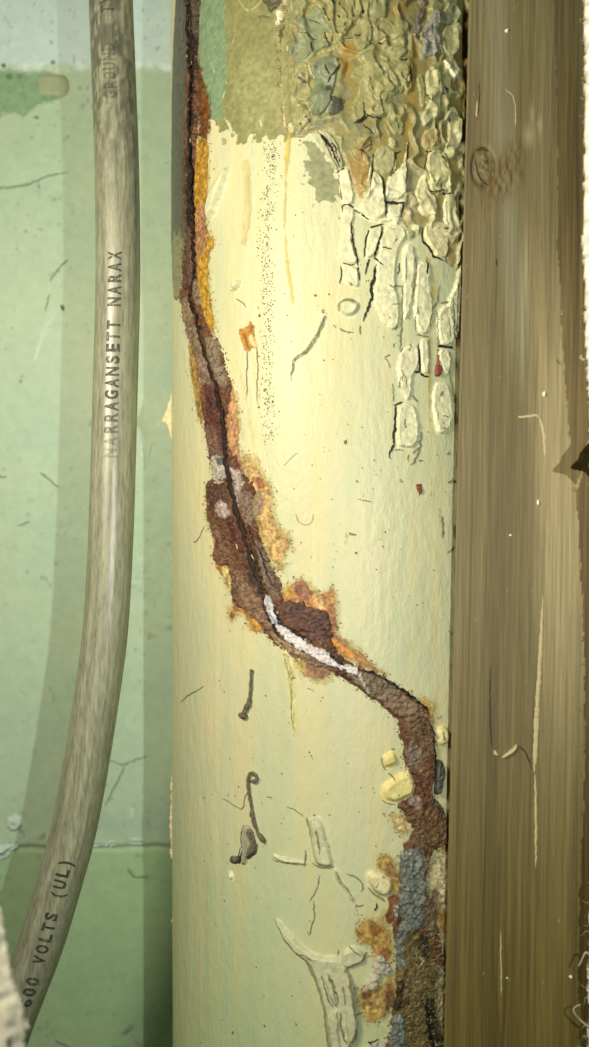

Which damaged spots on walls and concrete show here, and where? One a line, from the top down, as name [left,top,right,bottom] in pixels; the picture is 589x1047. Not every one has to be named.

corrosion [241,160,251,244]
corrosion [284,239,294,301]
peeling [238,0,469,450]
corrosion [239,321,264,441]
crack [171,0,458,1047]